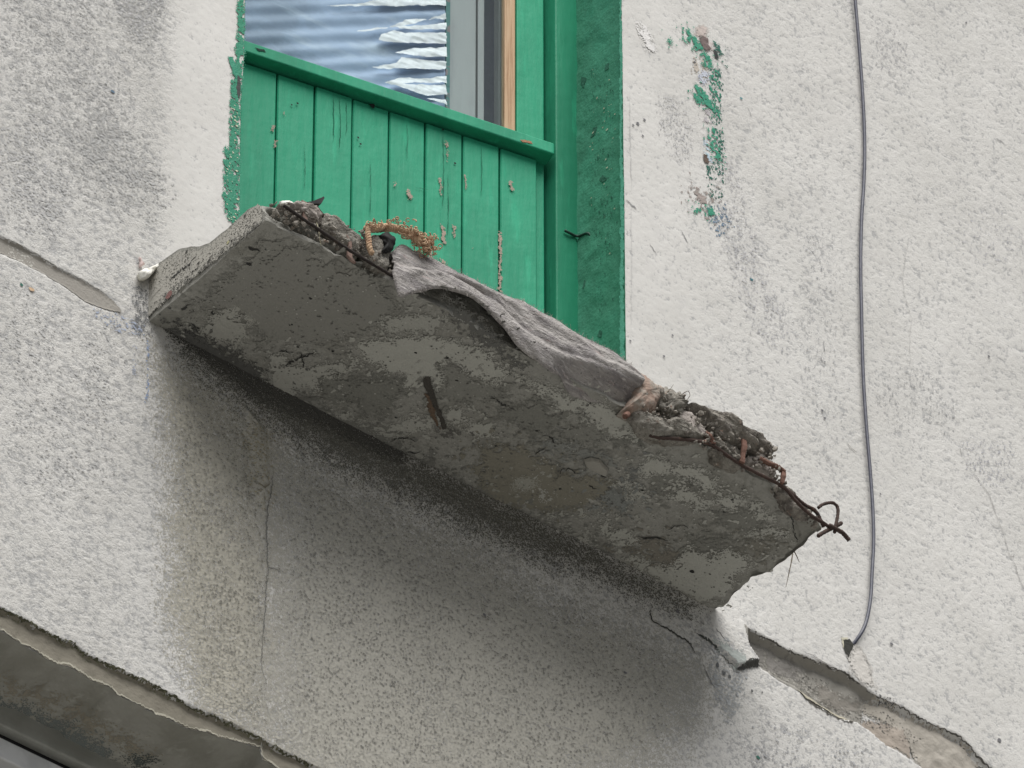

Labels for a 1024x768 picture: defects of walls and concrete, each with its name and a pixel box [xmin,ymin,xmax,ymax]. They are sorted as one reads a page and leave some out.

rust [423,377,447,430]
rust [758,456,786,472]
spalling [0,610,309,768]
crack [649,609,989,768]
spalling [716,624,979,768]